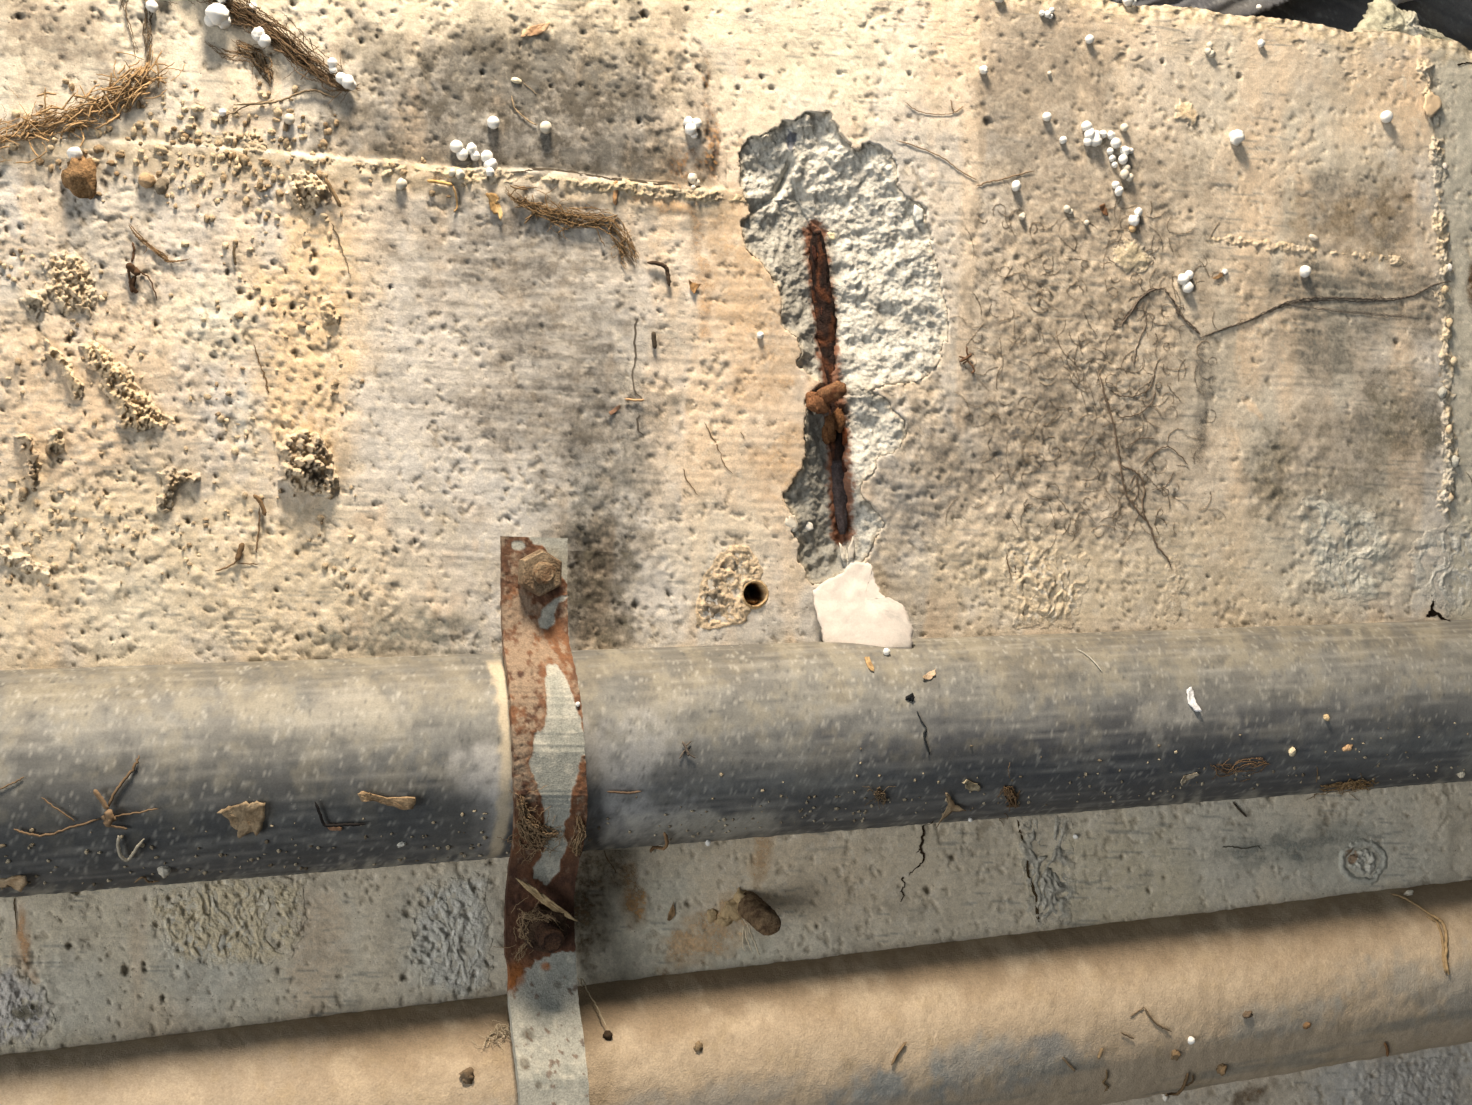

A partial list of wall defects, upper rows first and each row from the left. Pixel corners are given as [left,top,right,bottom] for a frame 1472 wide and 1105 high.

leakage [319,15,727,179]
leakage [1310,175,1407,250]
leakage [1269,261,1454,376]
leakage [420,210,678,648]
rust [805,391,846,445]
spalling [739,112,949,649]
leakage [1253,442,1297,501]
leakage [1342,384,1442,475]
leakage [322,611,469,656]
crack [900,821,933,902]